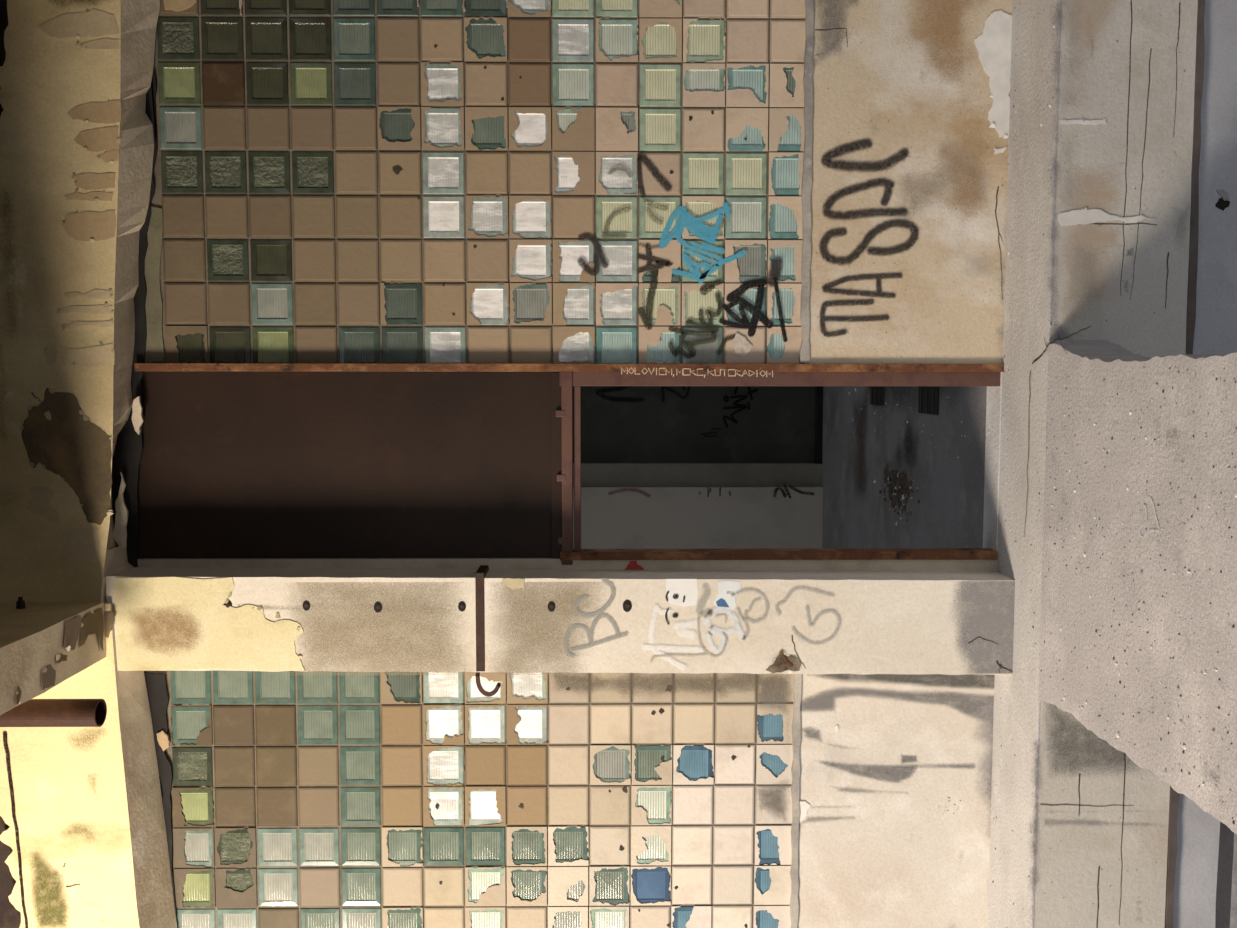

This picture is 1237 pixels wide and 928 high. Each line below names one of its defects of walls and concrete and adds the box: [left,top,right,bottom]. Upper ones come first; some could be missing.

damp [813,0,994,109]
peeling [975,10,1012,154]
peeling [20,71,305,916]